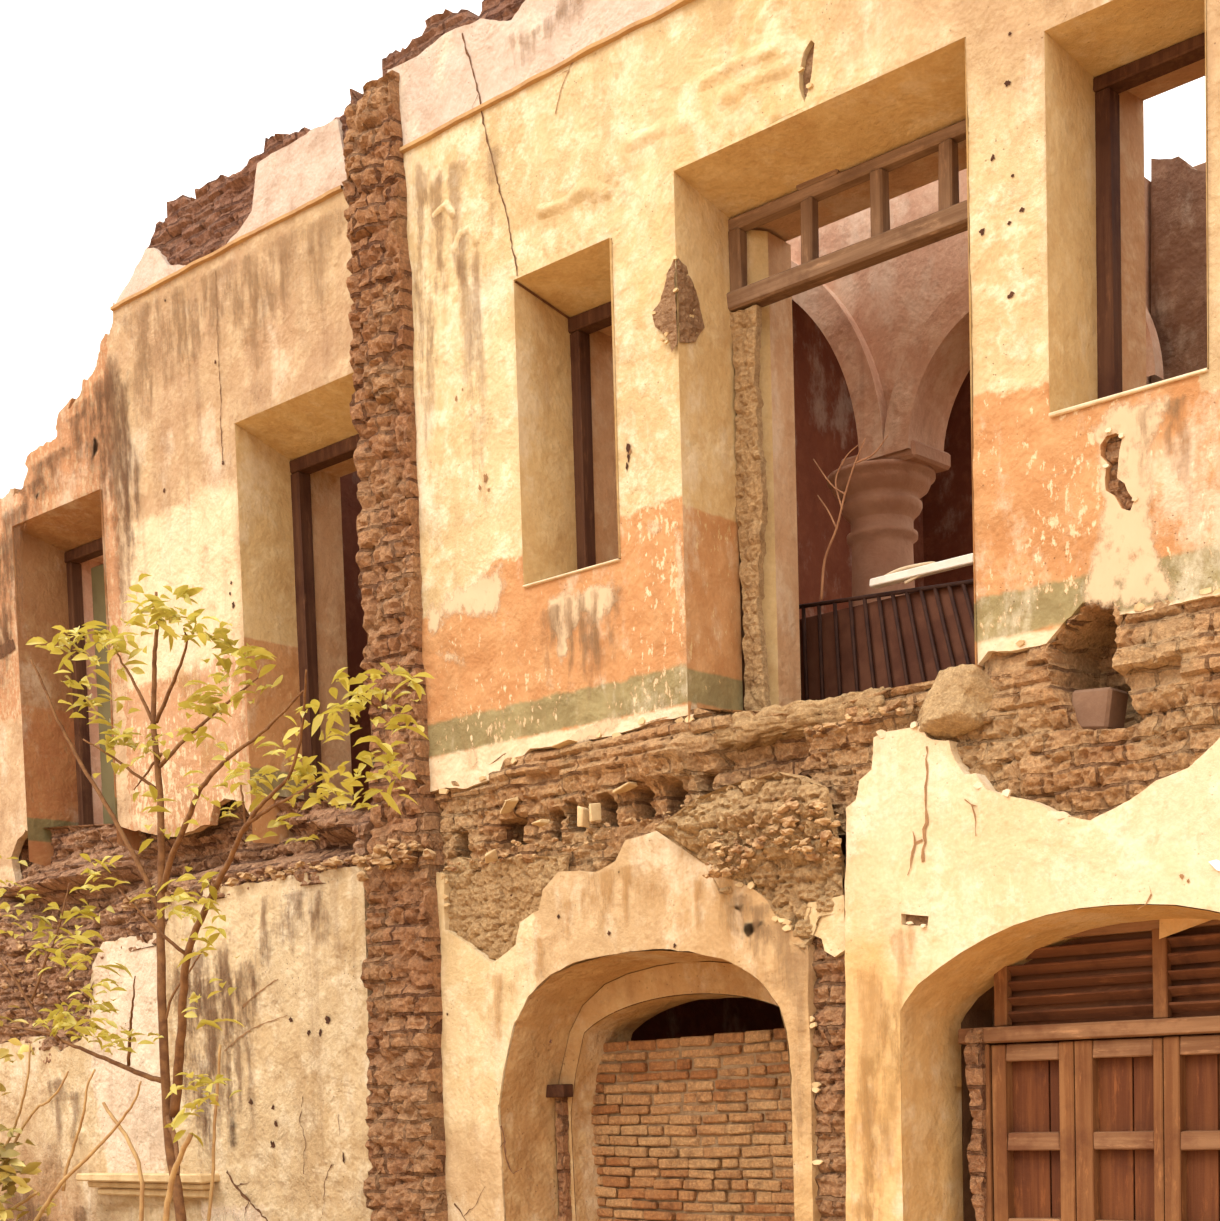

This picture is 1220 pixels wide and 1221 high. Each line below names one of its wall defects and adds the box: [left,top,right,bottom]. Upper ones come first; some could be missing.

flaking render [798,45,814,97]
crack [462,33,570,319]
flaking render [651,256,705,352]
peeling [426,564,502,632]
peeling [548,584,616,661]
flaking render [933,396,1220,820]
crack [907,746,929,875]
crack [964,799,976,836]
flaking render [0,796,375,1063]
crack [500,1125,522,1174]